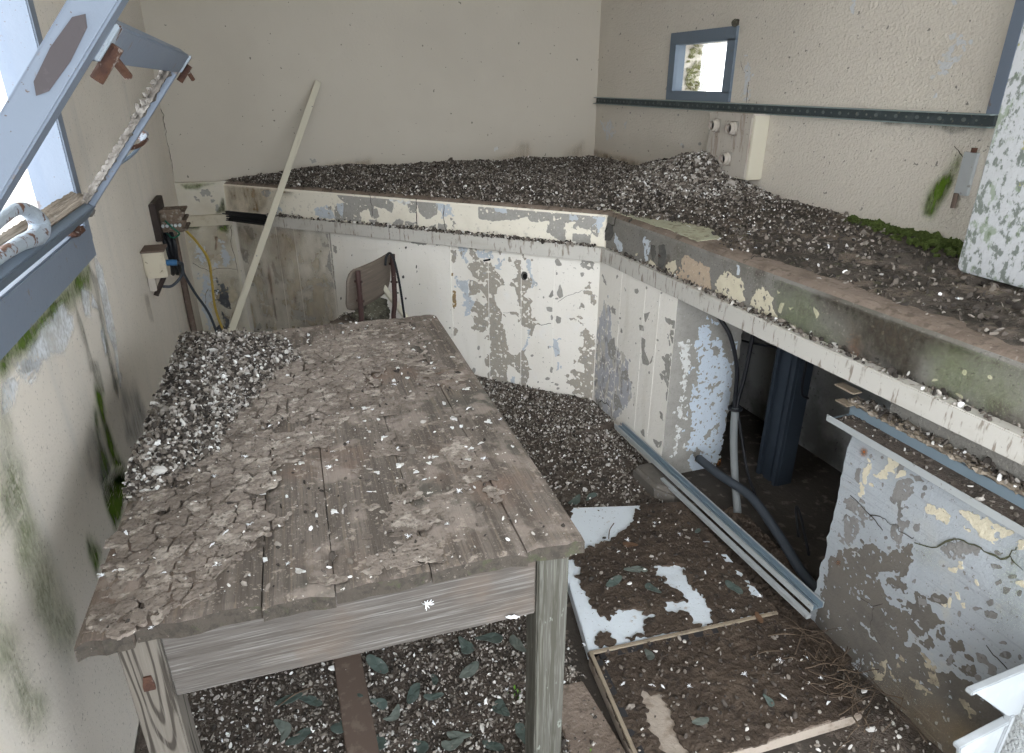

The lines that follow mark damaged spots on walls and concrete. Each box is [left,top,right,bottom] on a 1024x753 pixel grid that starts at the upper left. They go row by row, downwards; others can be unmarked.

damp [2,308,87,413]
damp [82,262,119,393]
peeling [314,195,456,230]
peeling [478,207,623,252]
peeling [405,242,738,471]
peeling [635,237,793,317]
crack [850,495,1023,570]
peeling [815,454,1024,753]